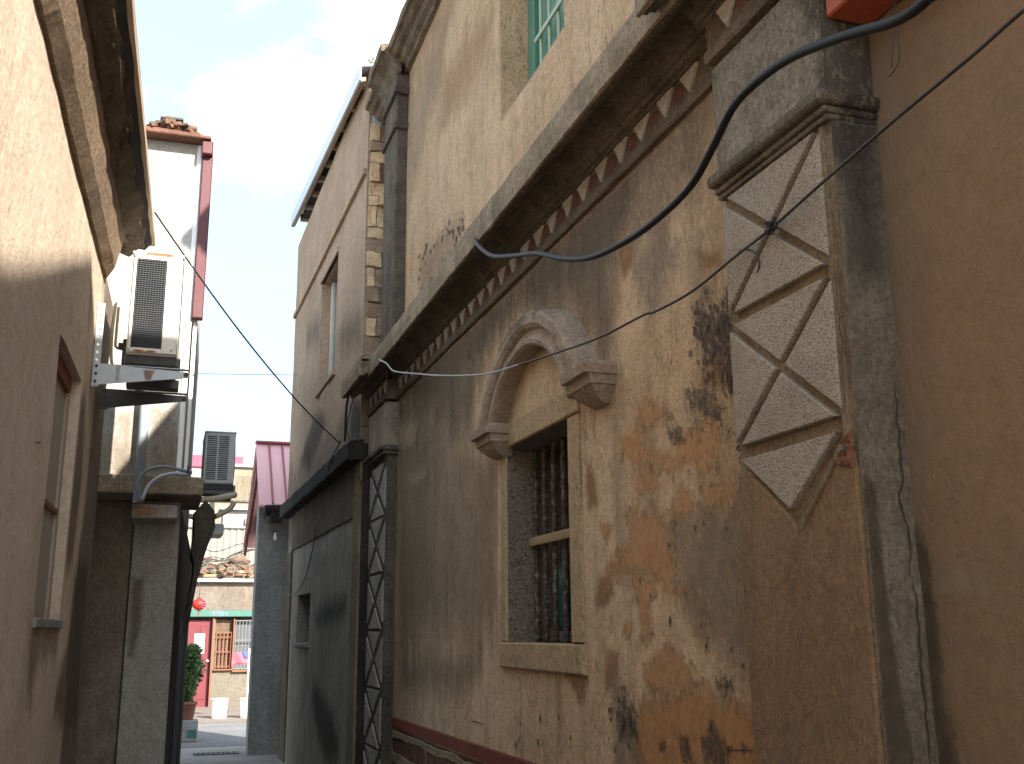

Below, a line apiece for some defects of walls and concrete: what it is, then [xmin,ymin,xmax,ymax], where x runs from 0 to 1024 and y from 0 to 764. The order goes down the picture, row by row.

leakage [682,286,733,431]
crack [894,383,930,764]
flaking render [635,616,756,764]